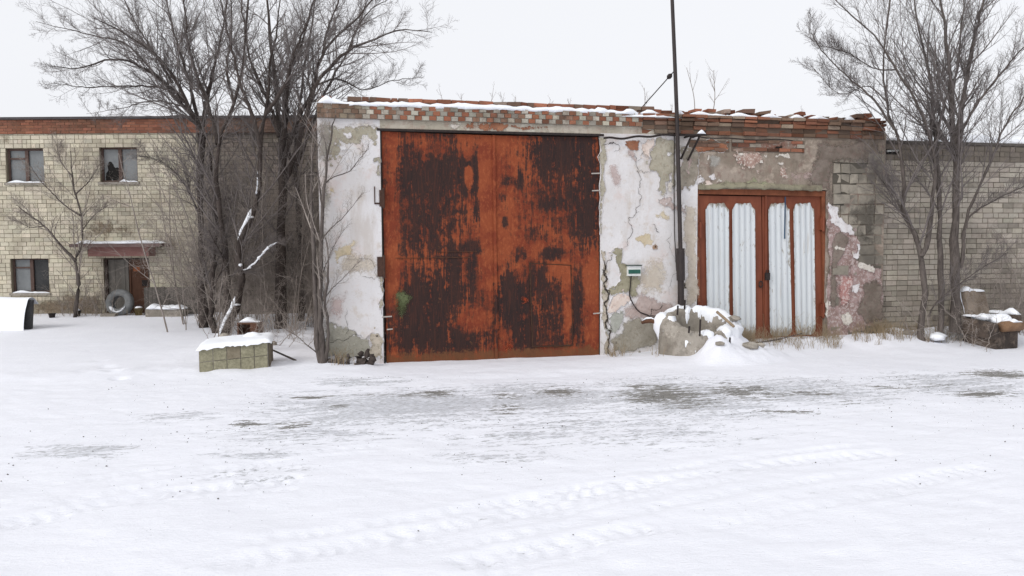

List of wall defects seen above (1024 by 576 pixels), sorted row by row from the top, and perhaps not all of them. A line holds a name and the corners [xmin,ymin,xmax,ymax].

flaking render [328,123,382,176]
spalling [598,136,607,235]
flaking render [624,136,804,214]
flaking render [600,247,657,355]
crack [602,142,676,354]
flaking render [825,151,885,336]